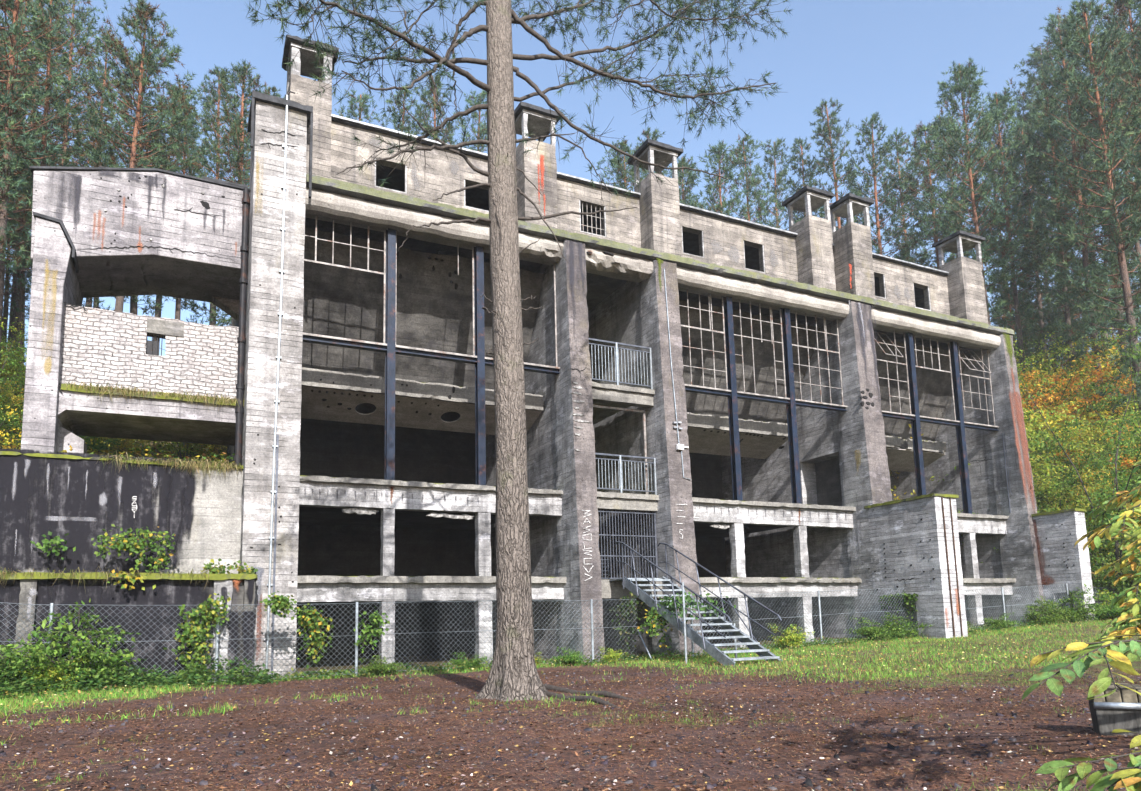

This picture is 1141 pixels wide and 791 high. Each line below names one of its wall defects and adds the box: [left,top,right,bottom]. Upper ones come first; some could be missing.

water stain [57,175,81,225]
corrosion [1009,369,1034,505]
water stain [0,448,263,684]
corrosion [1033,520,1054,585]